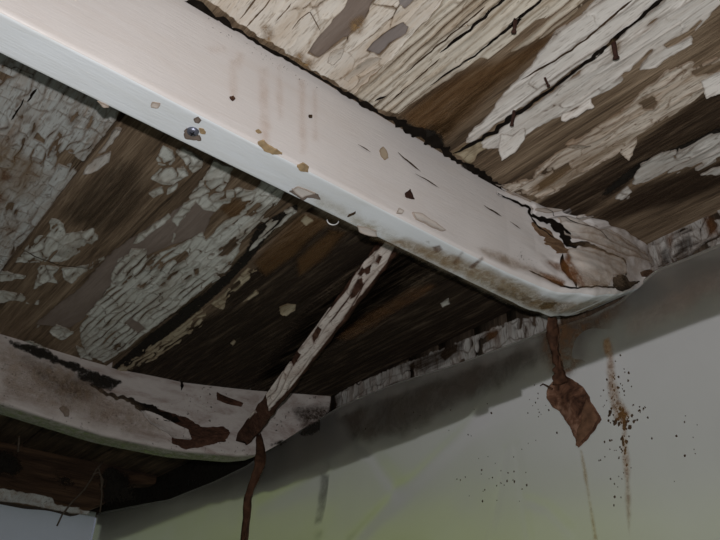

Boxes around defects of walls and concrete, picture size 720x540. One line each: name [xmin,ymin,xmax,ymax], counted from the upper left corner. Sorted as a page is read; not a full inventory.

peeling [0,53,321,371]
crack [185,0,662,289]
peeling [208,0,720,287]
leakage [4,340,137,428]
peeling [335,302,602,448]